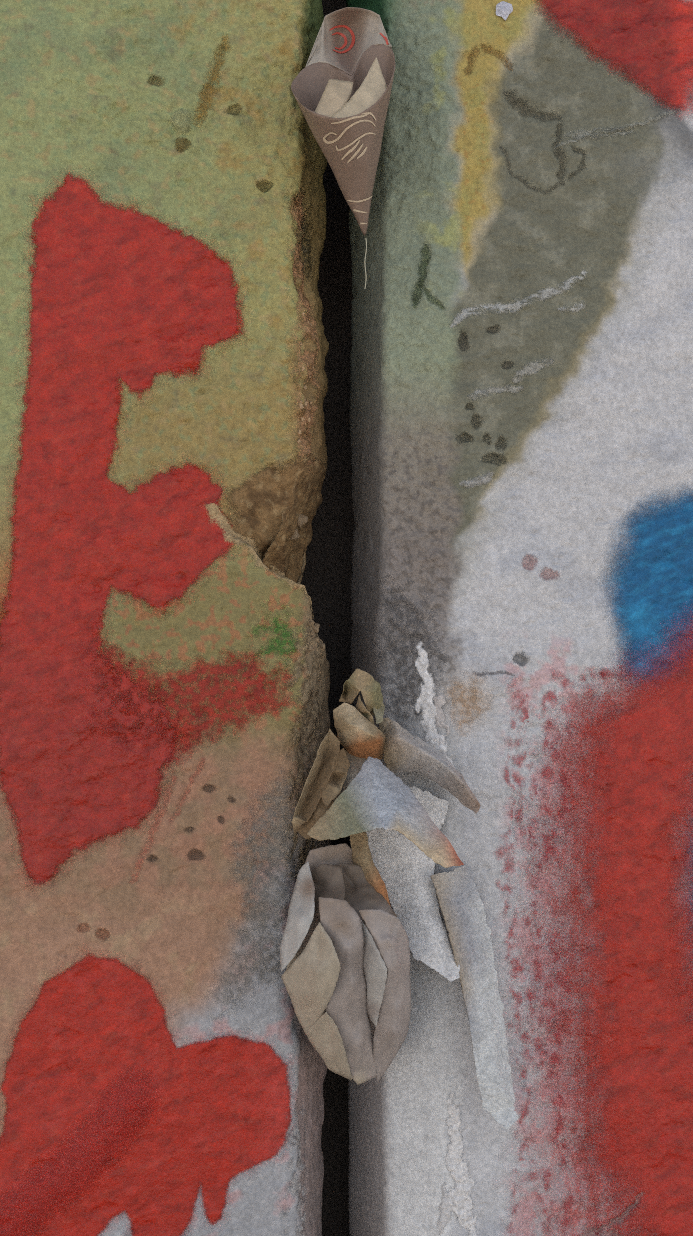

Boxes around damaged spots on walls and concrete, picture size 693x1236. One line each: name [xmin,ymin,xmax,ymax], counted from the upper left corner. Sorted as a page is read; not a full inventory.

spalling [522,555,559,579]
peeling [206,197,533,1130]
peeling [437,1092,478,1236]